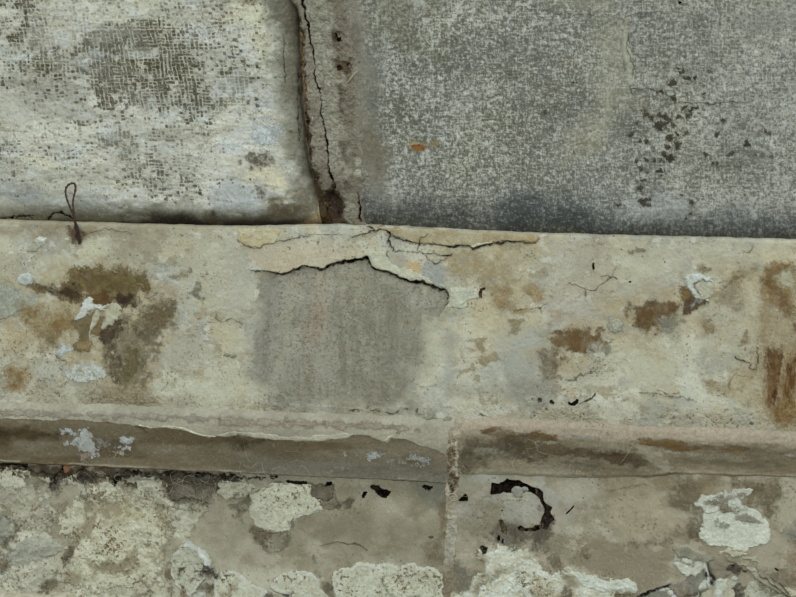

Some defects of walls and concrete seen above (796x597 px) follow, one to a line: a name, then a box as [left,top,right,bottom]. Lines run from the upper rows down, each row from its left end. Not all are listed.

crack [283,0,336,188]
rust [406,141,439,151]
water stain [0,264,177,392]
flaking render [72,296,123,352]
flaking render [255,250,486,401]
rust [761,260,796,330]
rust [762,343,796,429]
water stain [33,427,135,461]
water stain [458,427,647,474]
water stain [638,439,749,465]
flaking render [0,465,444,597]
flaking render [454,544,638,597]